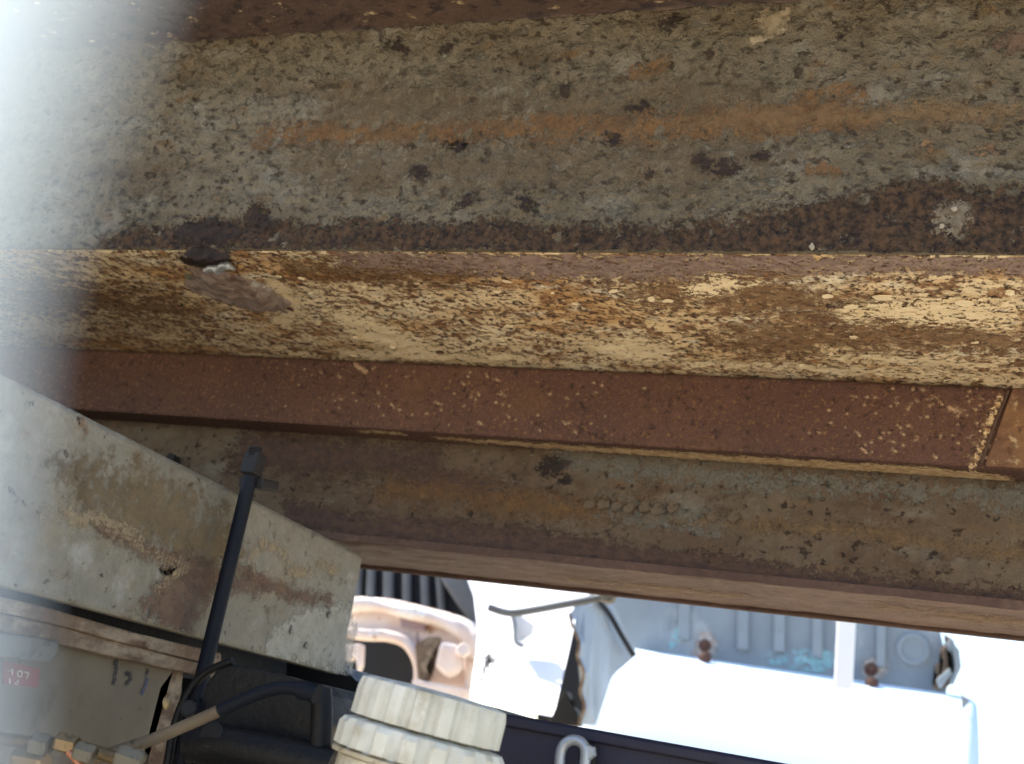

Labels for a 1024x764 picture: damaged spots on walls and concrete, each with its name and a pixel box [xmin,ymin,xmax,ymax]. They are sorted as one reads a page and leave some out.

corrosion [0,273,226,332]
peeling [321,308,541,422]
corrosion [93,174,1024,361]
peeling [647,273,763,303]
peeling [822,290,1024,344]
corrosion [95,520,221,634]